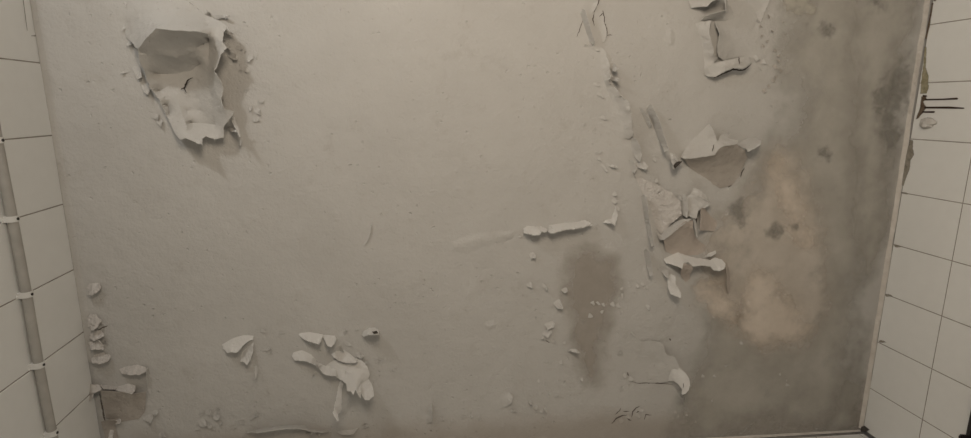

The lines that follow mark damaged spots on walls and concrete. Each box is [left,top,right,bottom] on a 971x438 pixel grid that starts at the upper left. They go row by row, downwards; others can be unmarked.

peeling [120,0,242,146]
crack [577,0,608,43]
peeling [688,0,783,93]
damp [920,47,929,94]
rust [916,95,964,119]
peeling [580,9,762,318]
peeling [519,192,620,238]
damp [685,0,915,438]
spalling [87,314,111,365]
spalling [89,365,158,438]
peeling [222,328,382,438]
damp [574,256,613,373]